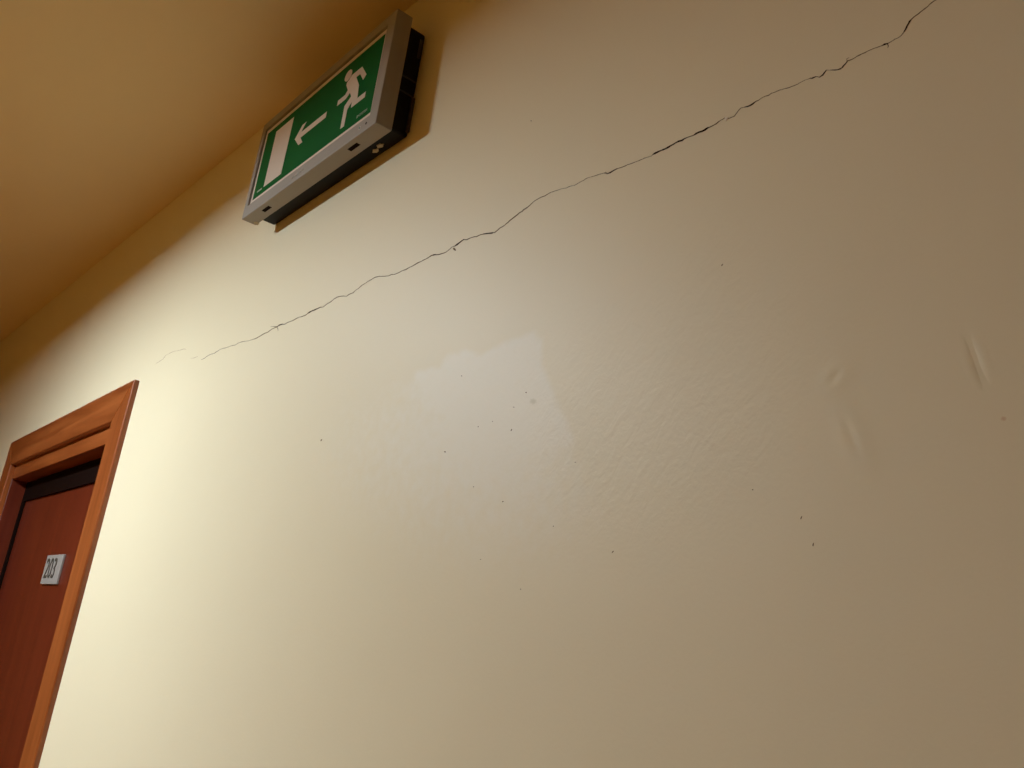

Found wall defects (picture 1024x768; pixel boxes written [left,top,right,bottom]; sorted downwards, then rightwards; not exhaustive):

crack [157,0,936,363]